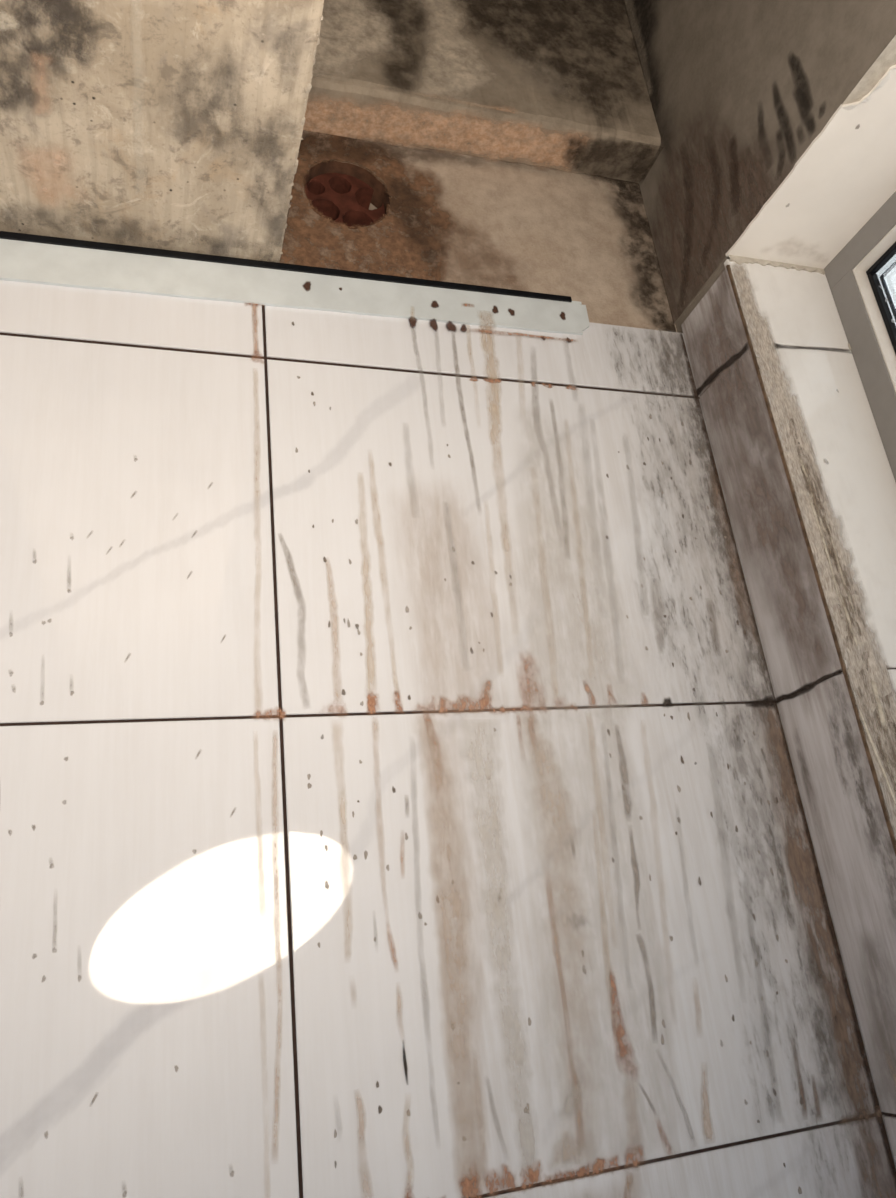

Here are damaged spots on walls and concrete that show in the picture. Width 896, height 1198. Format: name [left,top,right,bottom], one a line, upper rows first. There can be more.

damp [0,0,90,108]
damp [312,0,663,137]
flaking render [842,35,896,110]
rust [247,303,259,356]
damp [615,55,896,1198]
rust [256,709,285,719]
rust [429,660,545,727]
rust [460,1148,642,1198]